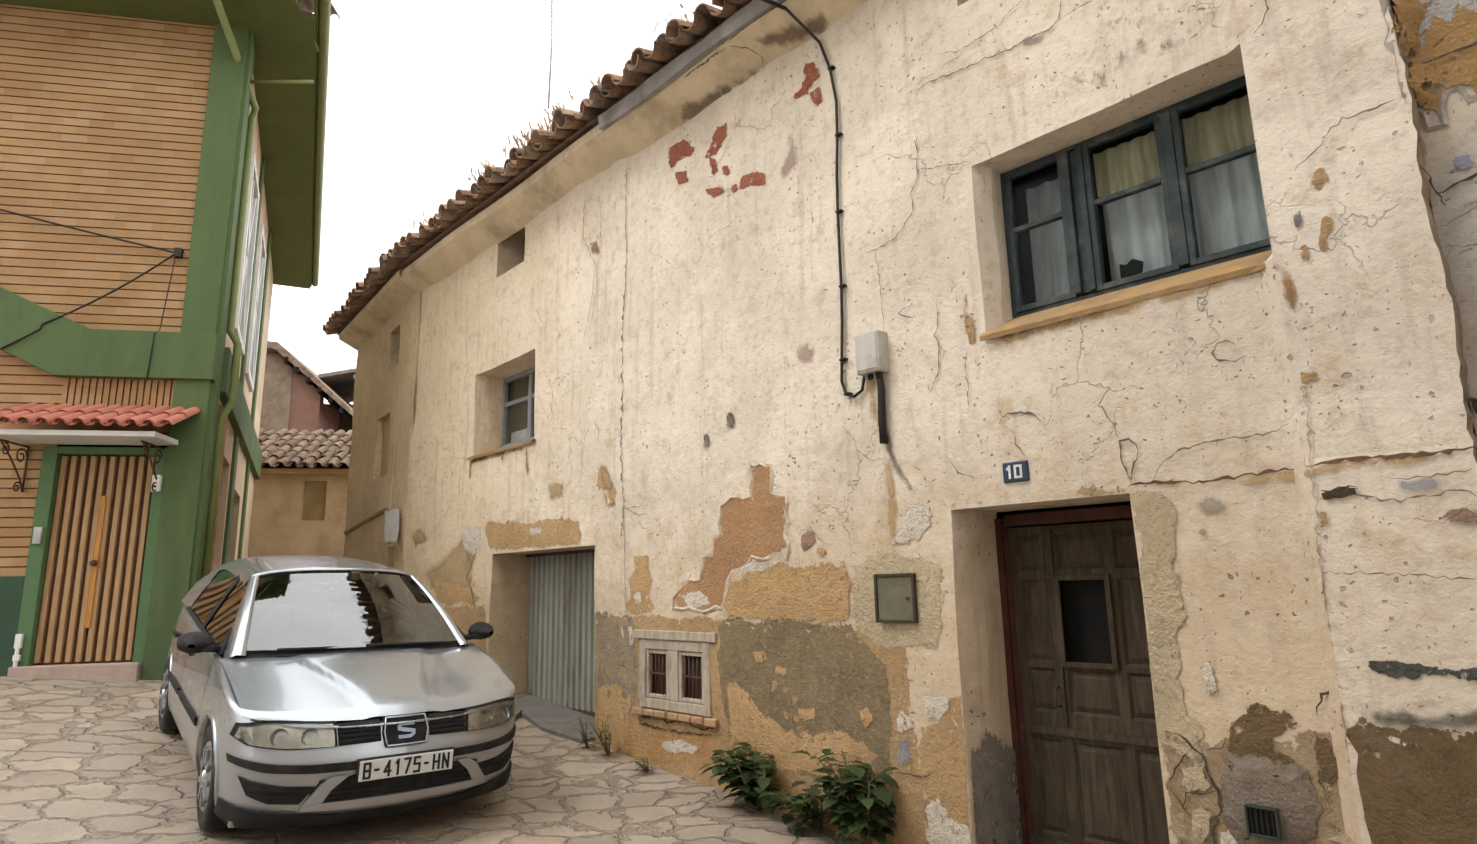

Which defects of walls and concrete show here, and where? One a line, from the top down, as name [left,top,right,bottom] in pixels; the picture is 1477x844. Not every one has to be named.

flaking render [794,62,822,105]
crack [916,0,1092,89]
flaking render [1379,0,1477,133]
flaking render [668,123,795,198]
crack [1295,91,1425,170]
crack [868,131,1055,456]
flaking render [798,345,812,361]
crack [1184,337,1247,362]
flaking render [549,483,562,499]
flaking render [428,516,582,653]
flaking render [595,461,1023,844]
flaking render [1077,485,1477,844]